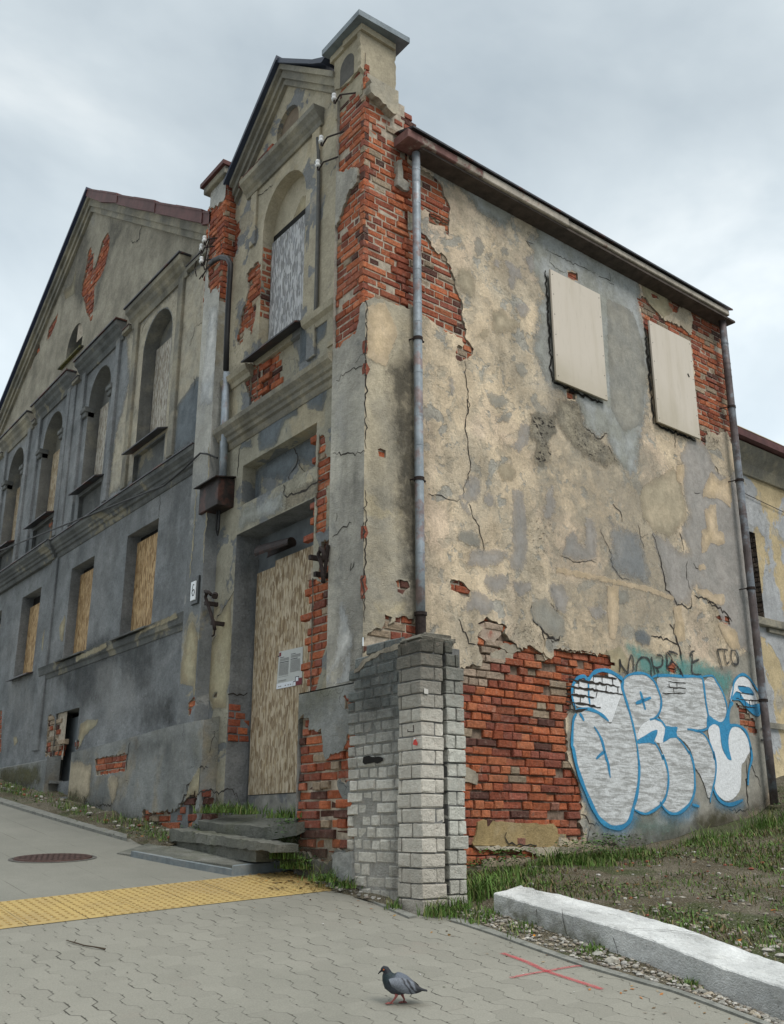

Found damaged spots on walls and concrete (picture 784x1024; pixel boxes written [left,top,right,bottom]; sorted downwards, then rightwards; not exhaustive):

flaking render [77,233,110,341]
peeling [108,143,274,496]
flaking render [244,352,284,403]
flaking render [299,53,515,376]
flaking render [239,390,331,692]
crack [283,447,325,498]
crack [430,363,484,551]
flaking render [450,228,768,868]
crack [562,504,698,662]
flaking render [45,712,127,804]
flaking render [297,714,355,864]